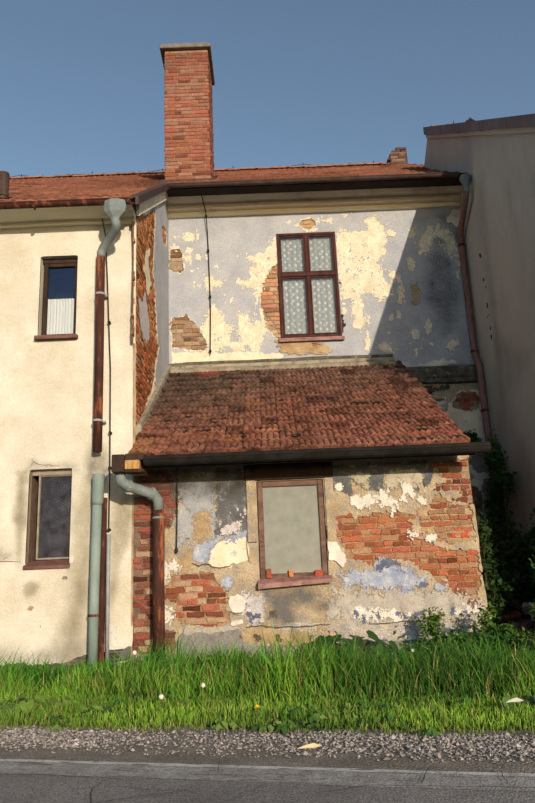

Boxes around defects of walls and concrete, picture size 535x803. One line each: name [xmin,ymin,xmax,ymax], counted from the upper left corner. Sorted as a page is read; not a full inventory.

spalling [131,206,333,429]
peeling [286,209,461,367]
peeling [432,389,485,442]
spalling [4,654,87,668]
spalling [104,494,153,663]
spalling [134,469,183,529]
spalling [164,508,338,651]
peeling [351,605,426,626]
spalling [326,453,490,616]
crack [393,766,508,787]